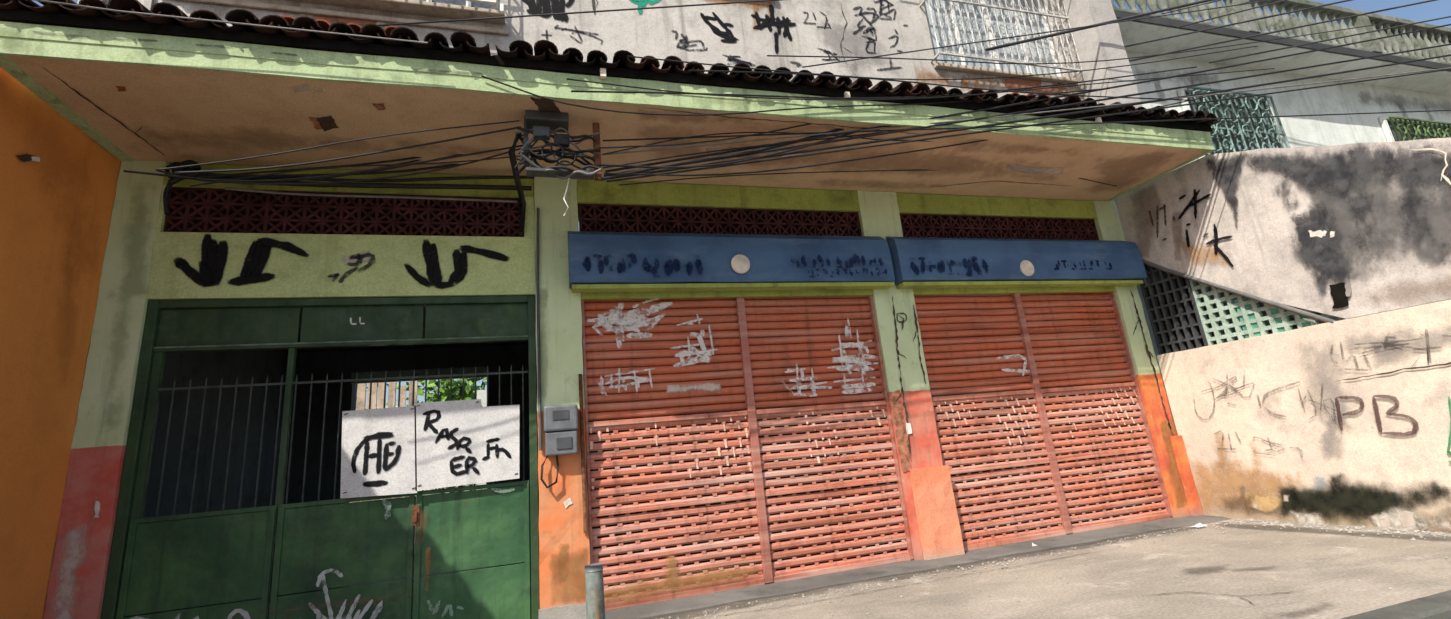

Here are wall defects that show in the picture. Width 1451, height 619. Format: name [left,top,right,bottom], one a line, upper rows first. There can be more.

crack [44,68,165,156]
damp [1206,144,1451,294]
damp [1196,445,1449,519]
peeling [57,530,83,619]